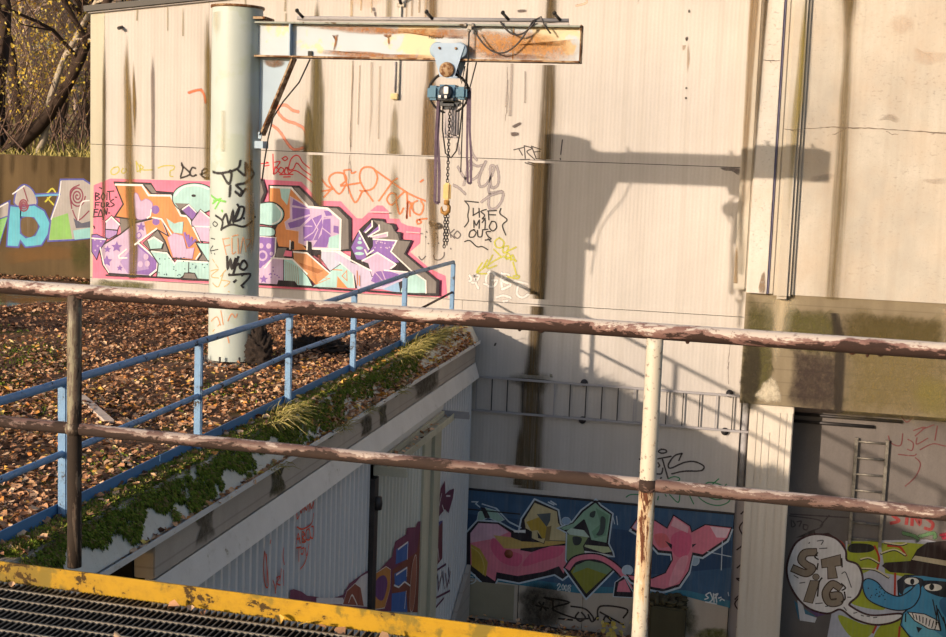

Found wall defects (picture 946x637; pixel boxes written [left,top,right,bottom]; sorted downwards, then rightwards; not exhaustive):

leakage [546,0,555,18]
rust [469,33,566,58]
leakage [125,57,137,279]
leakage [304,59,323,206]
leakage [530,65,554,315]
leakage [830,0,853,299]
crack [785,126,946,135]
leakage [775,299,789,331]
leakage [832,313,843,336]
leakage [516,331,541,468]
leakage [740,347,844,413]
leakage [514,479,539,490]